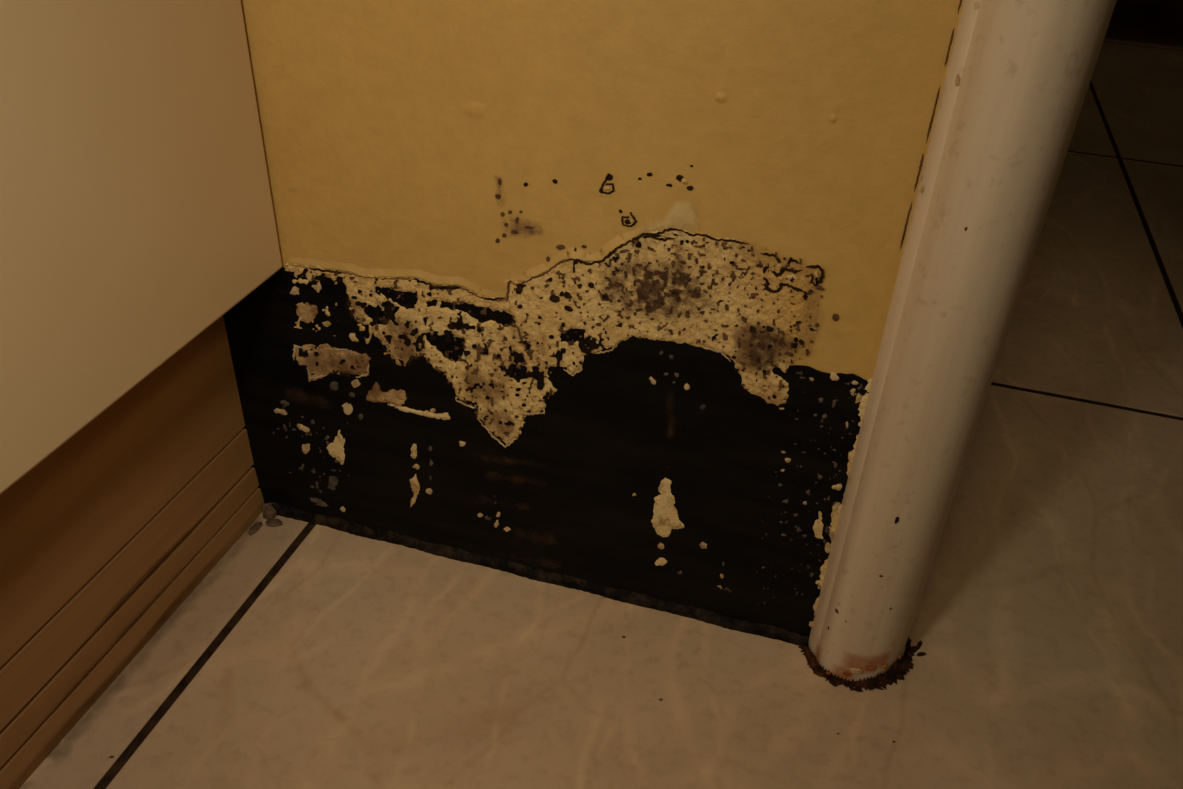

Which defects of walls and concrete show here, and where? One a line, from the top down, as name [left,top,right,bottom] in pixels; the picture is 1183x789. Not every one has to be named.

water stain [495,179,534,243]
water stain [646,202,696,231]
water stain [605,254,699,317]
peeling [273,227,824,512]
peeling [477,495,511,532]
peeling [651,467,684,566]
peeling [756,372,872,627]
corrosion [798,637,926,692]